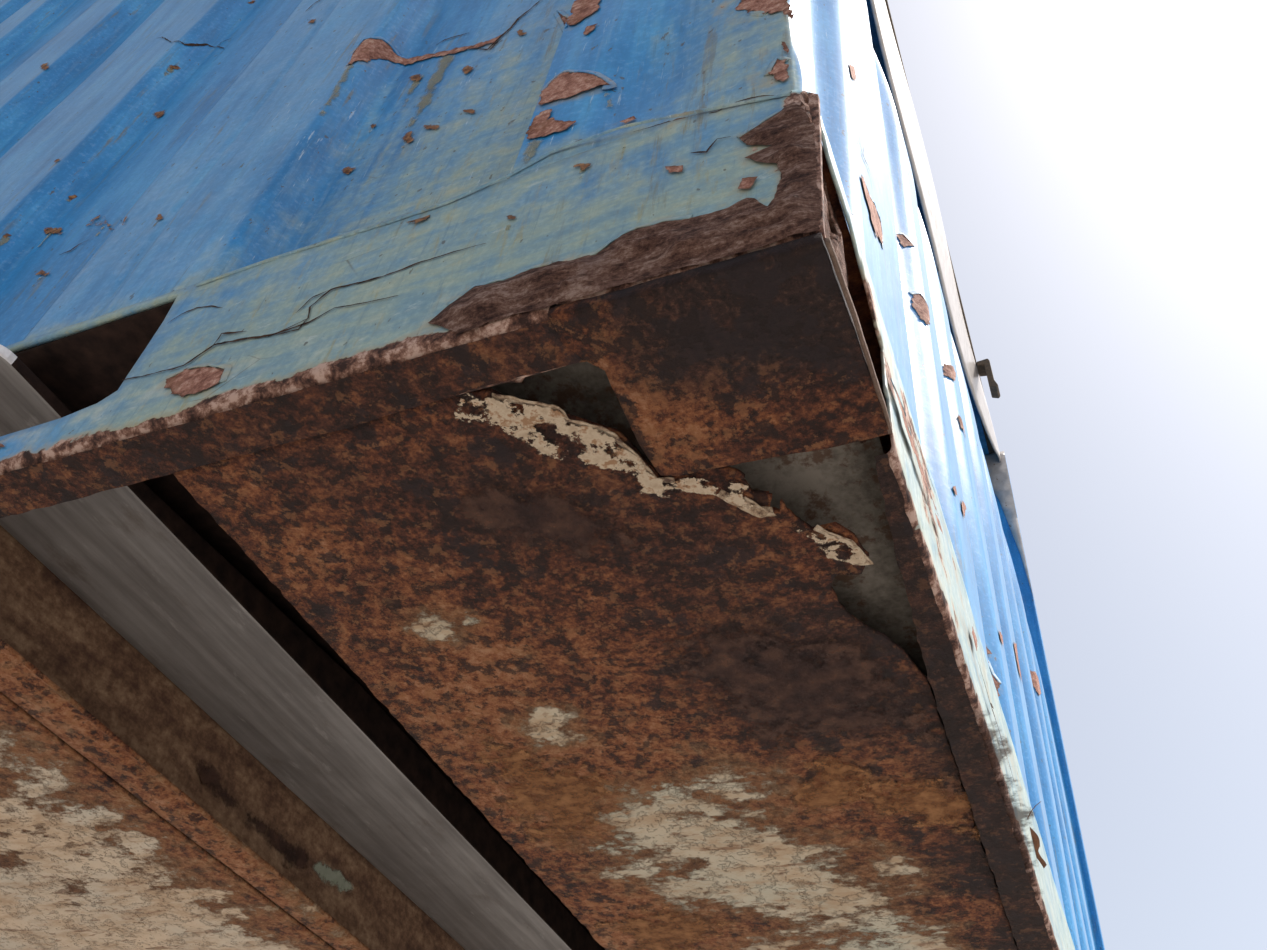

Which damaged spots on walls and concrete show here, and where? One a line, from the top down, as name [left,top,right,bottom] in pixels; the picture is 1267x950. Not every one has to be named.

peeling [734,0,794,21]
peeling [320,35,501,125]
peeling [524,69,617,160]
corrosion [38,227,63,247]
peeling [861,176,916,250]
crack [123,243,485,380]
peeling [908,291,930,325]
peeling [454,393,776,518]
peeling [797,524,874,566]
corrosion [197,760,309,868]
corrosion [794,757,980,836]
corrosion [974,707,1036,894]